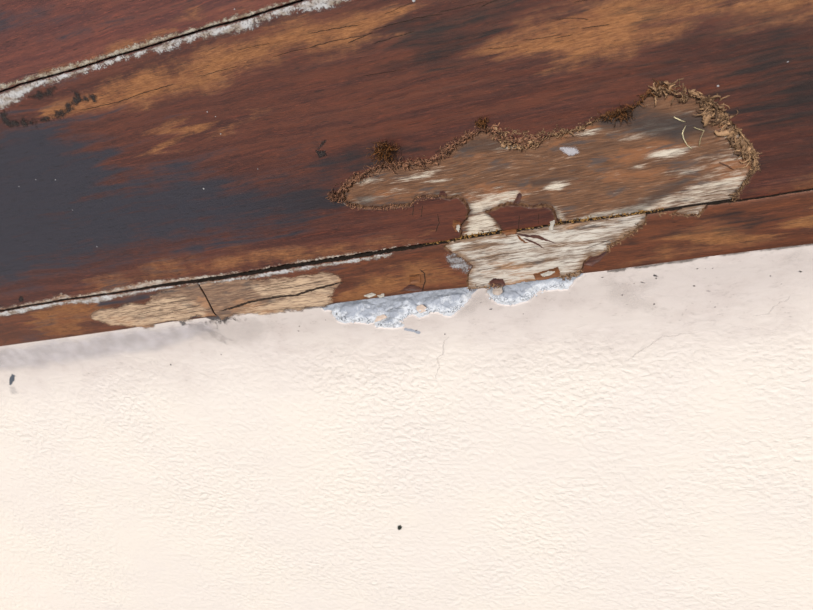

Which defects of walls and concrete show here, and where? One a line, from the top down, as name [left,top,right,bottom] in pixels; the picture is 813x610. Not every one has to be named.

leakage [0,0,348,127]
peeling [501,220,555,249]